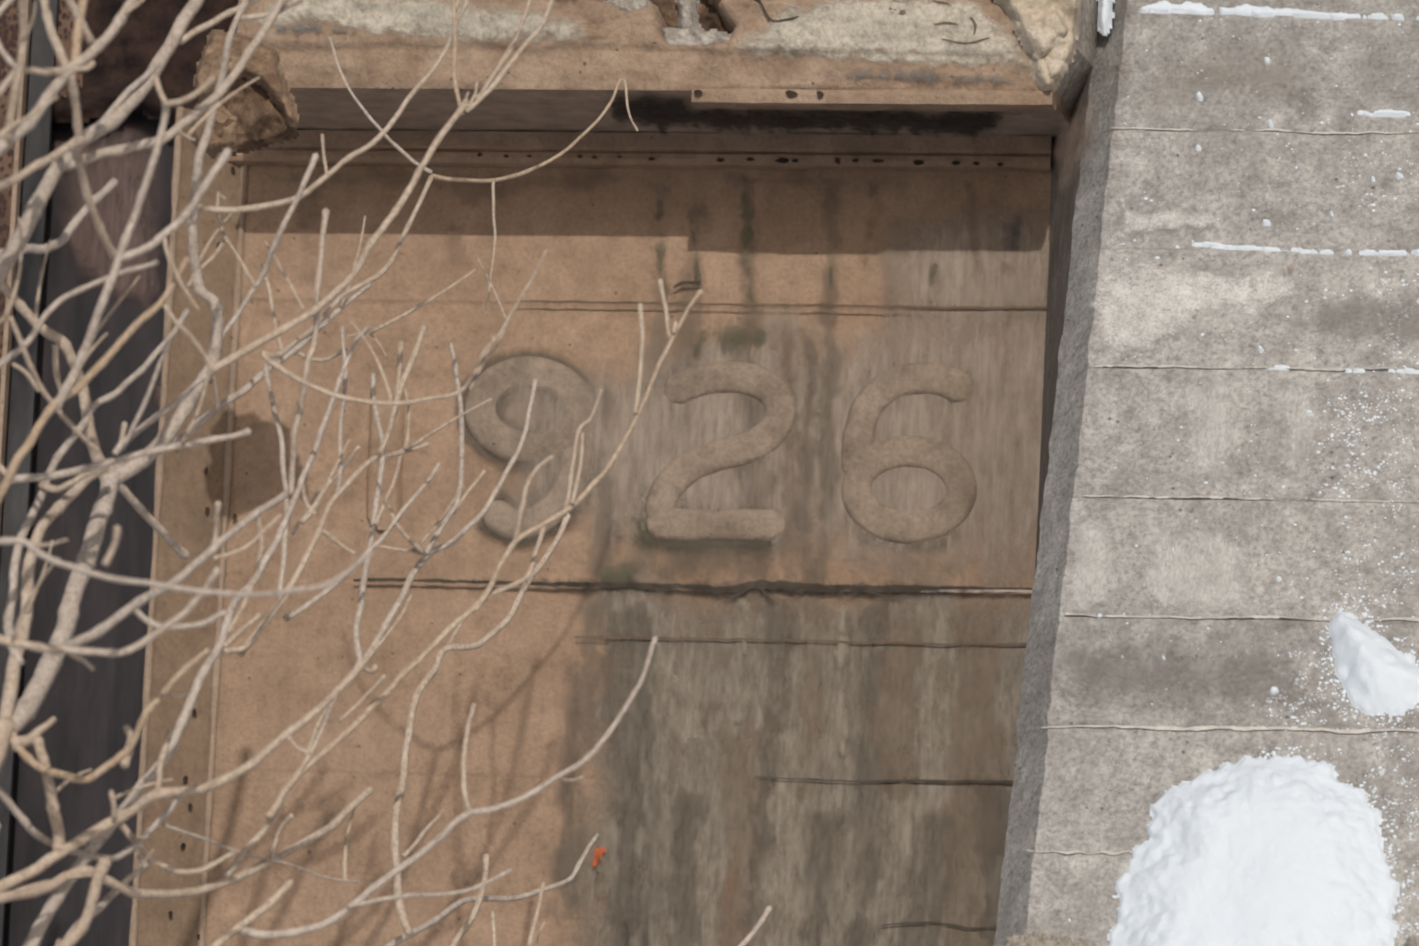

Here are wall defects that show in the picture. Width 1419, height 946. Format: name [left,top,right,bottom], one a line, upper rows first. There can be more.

spalling [191,0,590,173]
damp [611,98,1002,136]
peeling [604,0,1098,112]
damp [511,385,565,435]
damp [577,215,1050,577]
damp [516,449,567,508]
damp [536,563,1030,946]